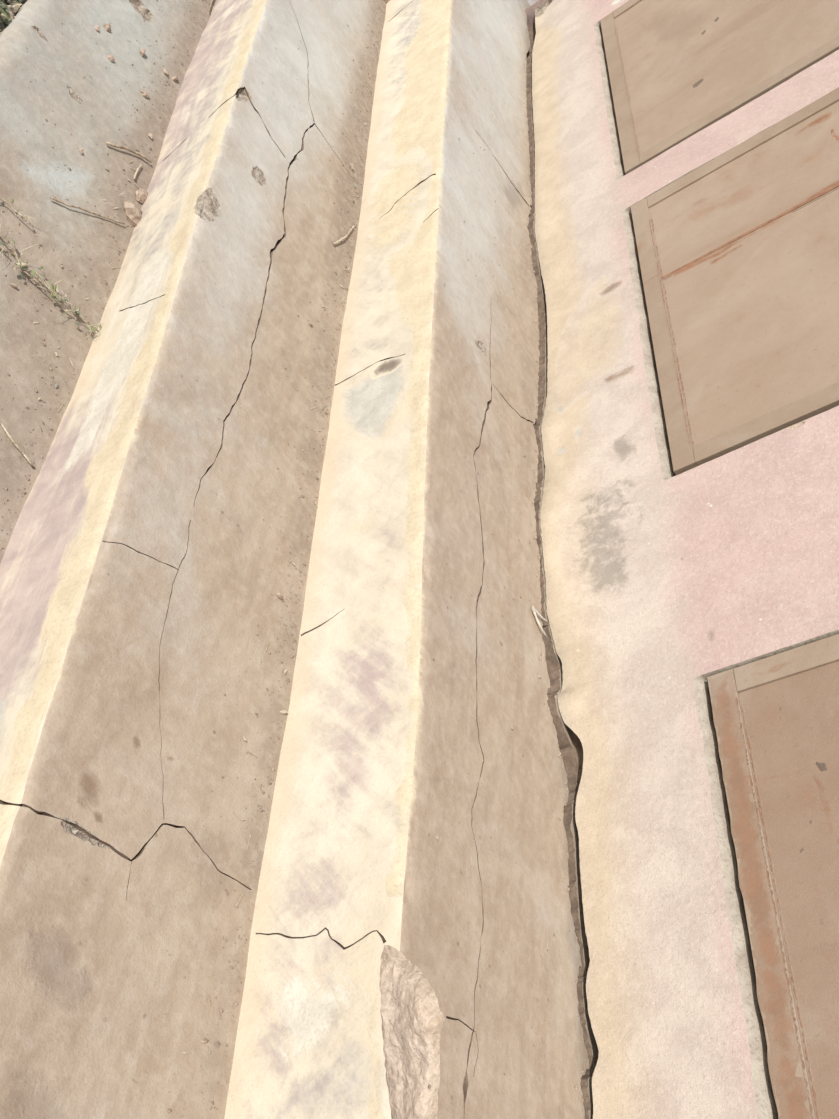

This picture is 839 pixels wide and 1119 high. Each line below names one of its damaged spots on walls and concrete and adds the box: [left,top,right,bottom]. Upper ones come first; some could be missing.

crack [379,173,436,219]
crack [0,1,351,900]
crack [335,353,406,386]
crack [446,26,573,1114]
crack [256,927,386,950]
spalling [360,945,445,1119]
crack [563,783,594,1119]